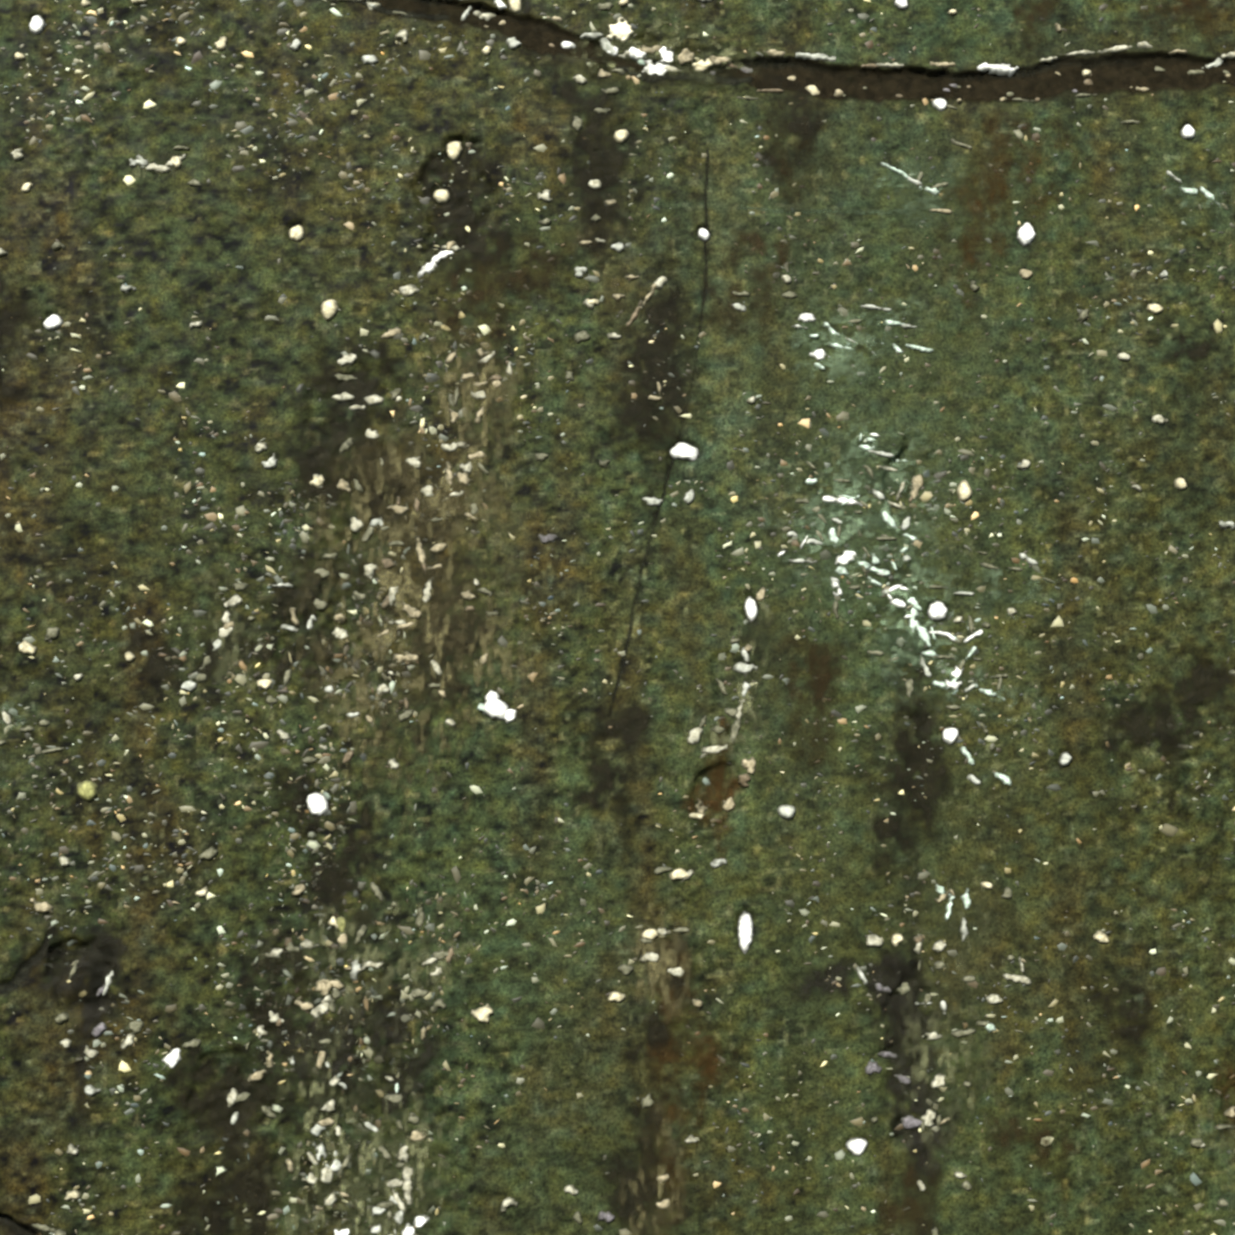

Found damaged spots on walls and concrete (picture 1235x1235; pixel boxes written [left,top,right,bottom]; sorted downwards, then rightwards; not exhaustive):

crack [331,0,1235,124]
crack [0,933,73,995]
crack [0,1214,56,1235]